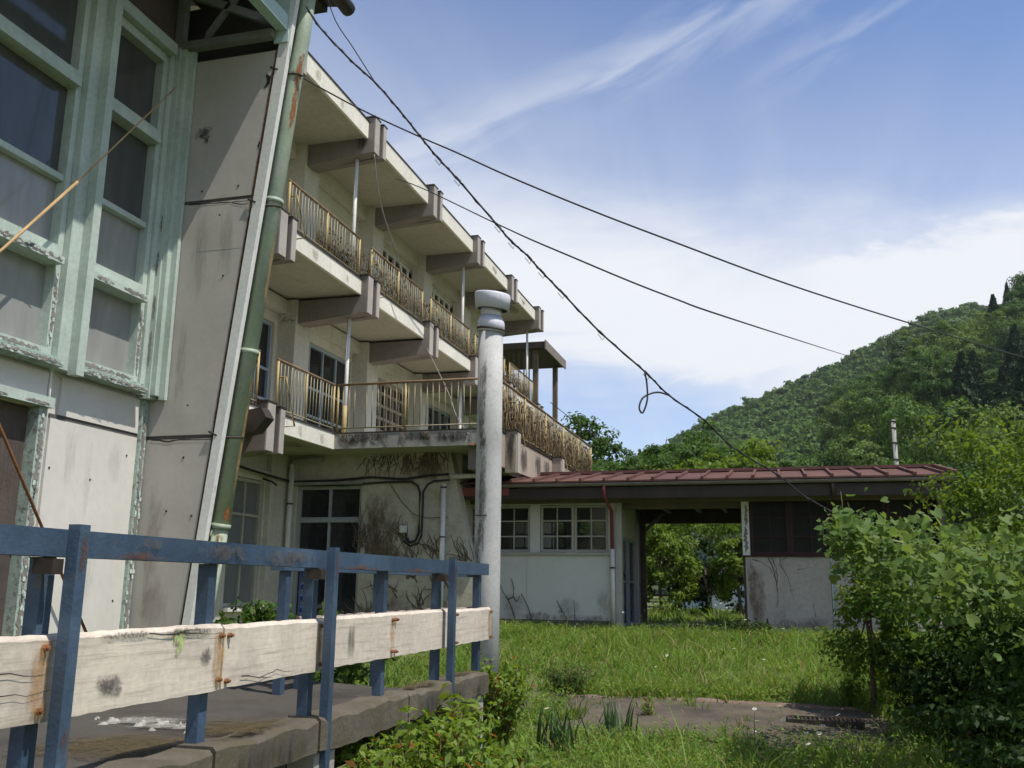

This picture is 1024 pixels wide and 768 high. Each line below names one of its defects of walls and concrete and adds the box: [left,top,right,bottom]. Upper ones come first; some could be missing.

rust [289,56,304,127]
peeling [0,227,63,261]
peeling [84,275,156,391]
peeling [26,398,51,527]
damp [476,470,485,563]
peeling [16,556,29,636]